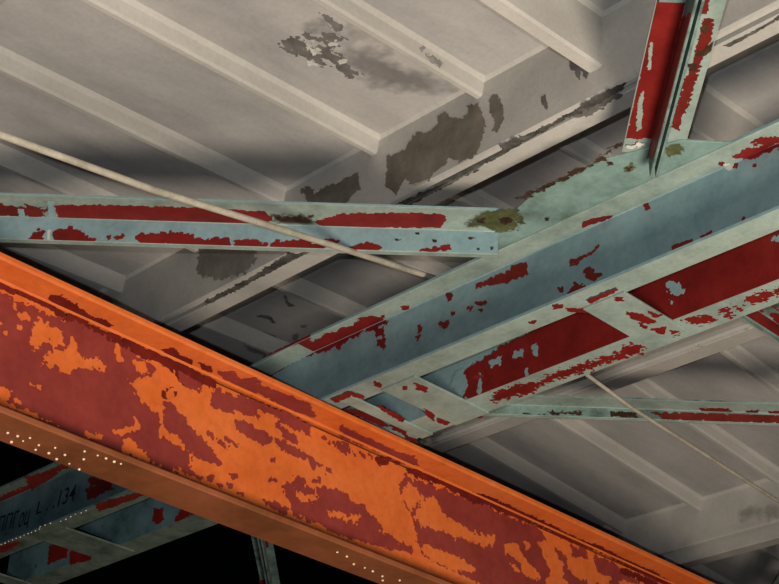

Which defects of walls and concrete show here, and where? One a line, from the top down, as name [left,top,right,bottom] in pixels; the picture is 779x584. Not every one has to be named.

peeling [277,12,364,79]
peeling [626,0,714,160]
peeling [384,94,504,195]
peeling [718,136,779,171]
peeling [300,172,361,203]
peeling [0,201,447,250]
peeling [420,239,452,252]
peeling [582,215,613,228]
peeling [450,230,779,404]
peeling [0,282,671,584]
peeling [650,408,779,423]